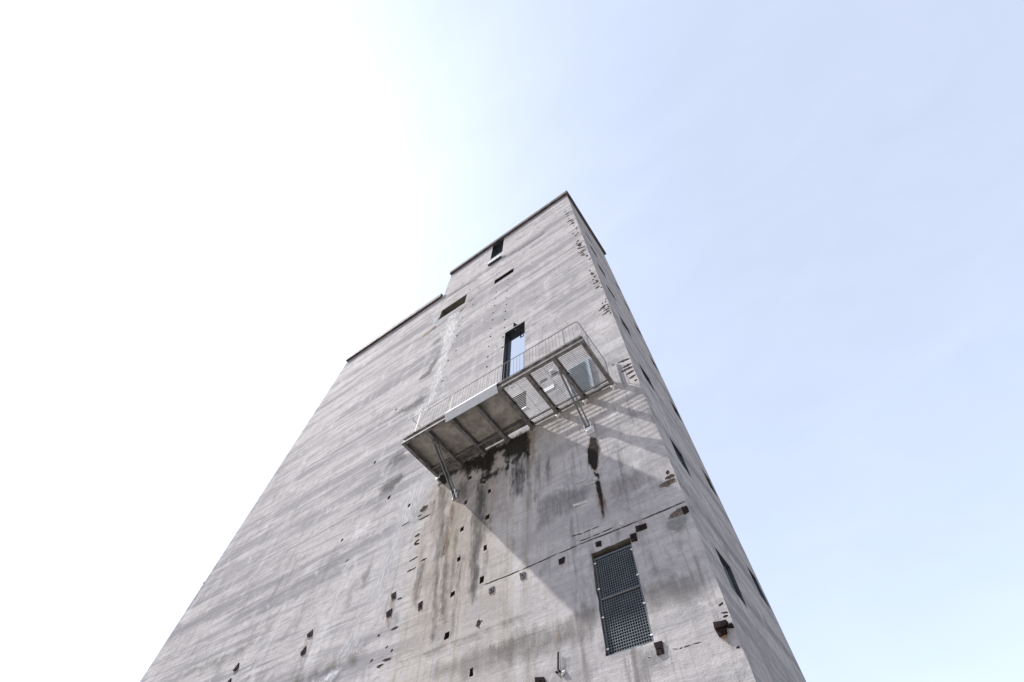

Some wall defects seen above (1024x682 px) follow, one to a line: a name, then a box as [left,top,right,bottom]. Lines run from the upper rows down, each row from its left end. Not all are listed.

leakage [373,432,530,597]